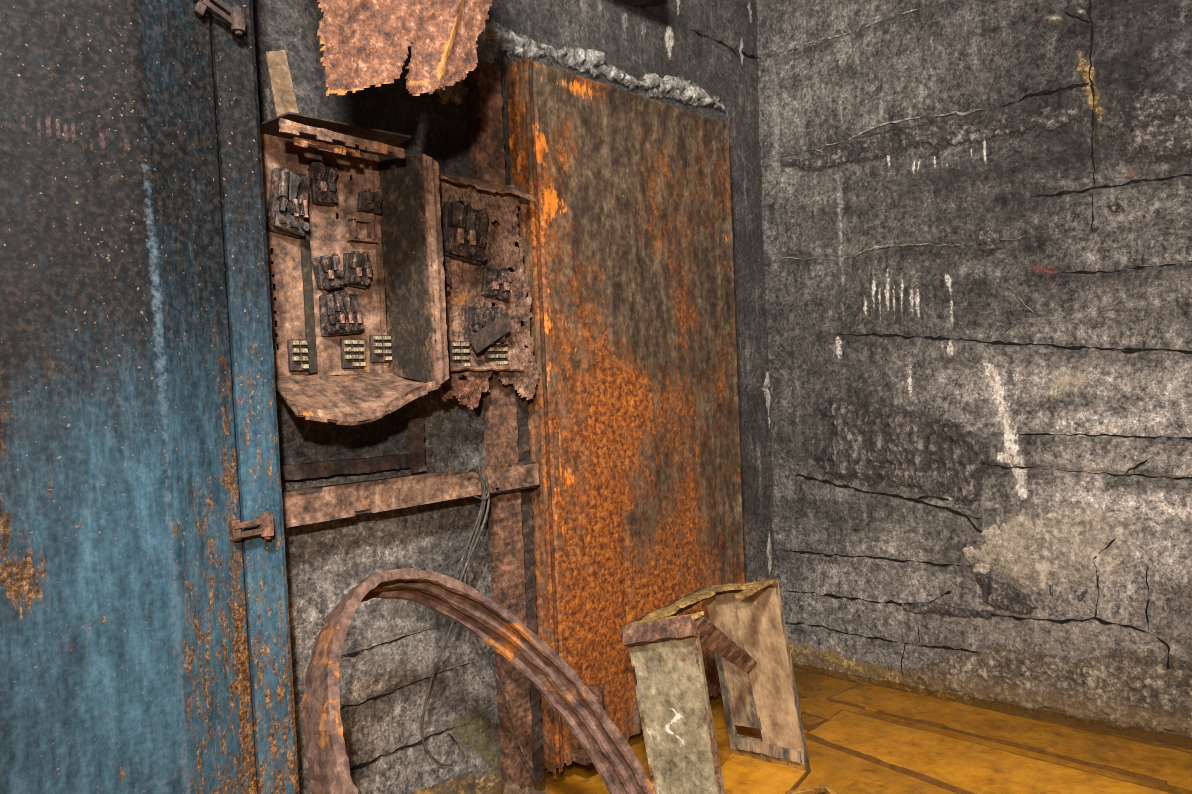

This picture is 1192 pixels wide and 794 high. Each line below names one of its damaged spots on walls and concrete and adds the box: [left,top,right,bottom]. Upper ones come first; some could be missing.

spalling [436,78,468,106]
spalling [476,18,725,111]
crack [765,0,1191,232]
crack [1062,261,1192,273]
crack [836,333,1192,354]
damp [984,363,1027,499]
crack [792,474,982,533]
crack [341,622,456,657]
crack [783,550,978,675]
crack [991,538,1170,669]
crack [340,661,478,709]
crack [350,721,470,771]